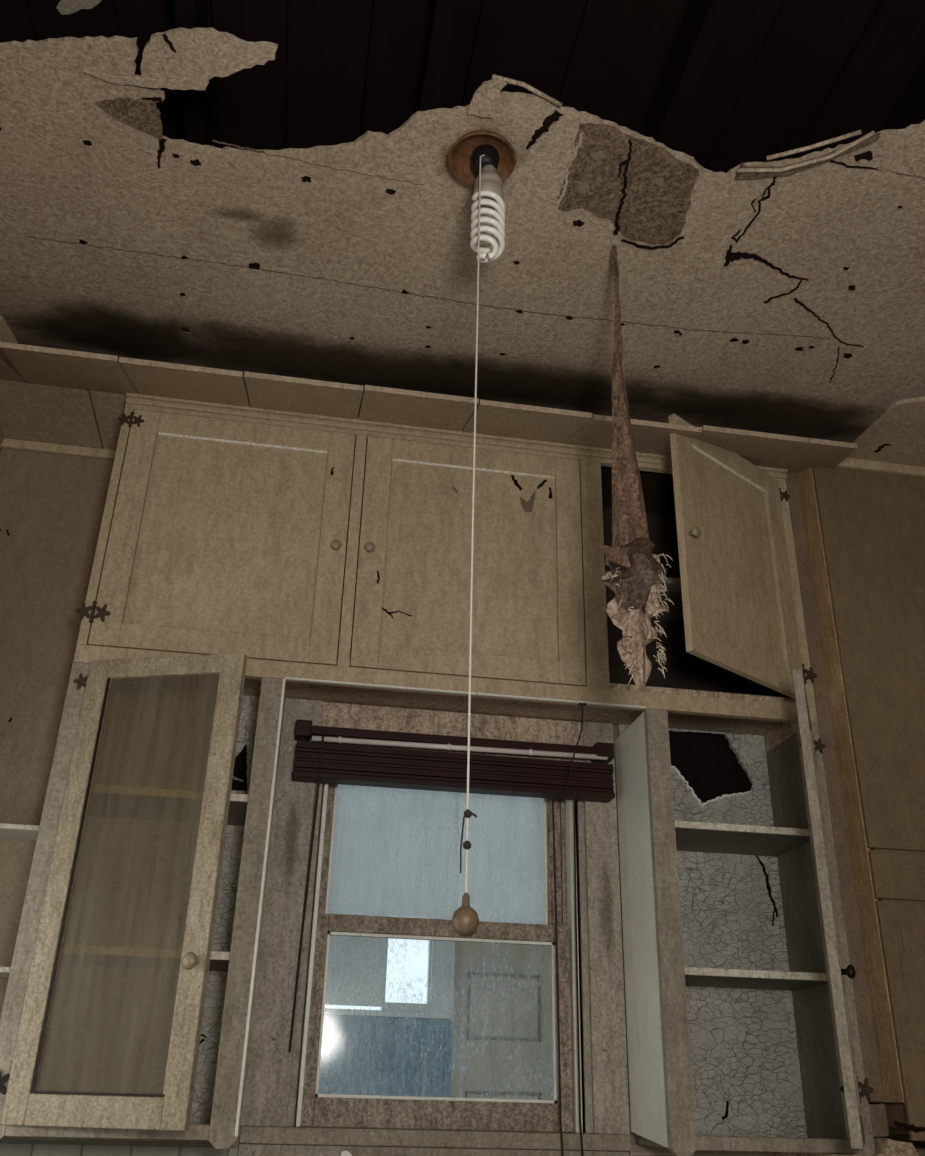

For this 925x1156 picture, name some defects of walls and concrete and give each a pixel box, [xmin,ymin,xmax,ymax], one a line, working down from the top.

crack [162,33,176,52]
crack [526,110,564,149]
crack [613,139,632,235]
peeling [554,123,699,250]
crack [829,151,925,179]
crack [25,176,864,383]
damp [33,307,612,409]
damp [626,385,860,438]
crack [755,855,778,926]